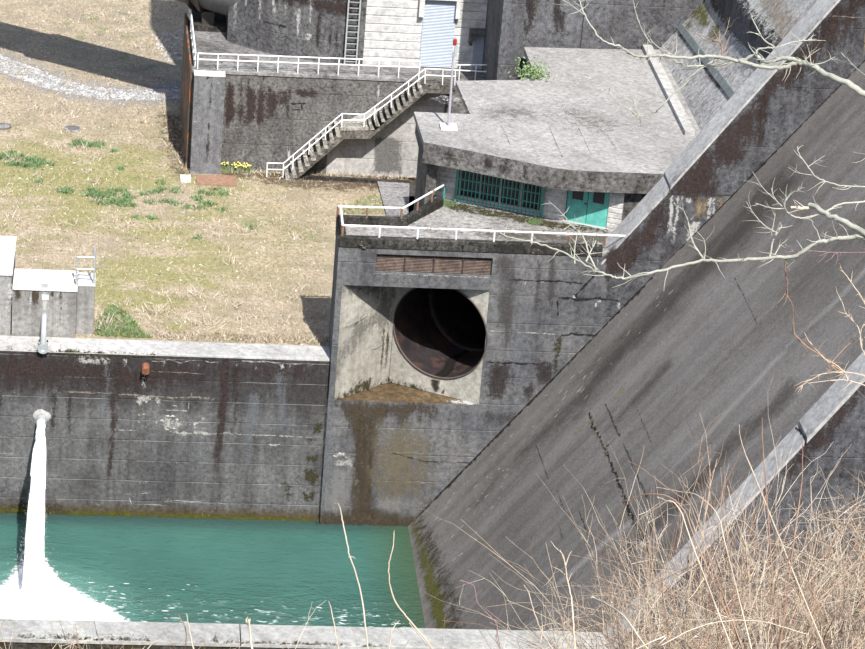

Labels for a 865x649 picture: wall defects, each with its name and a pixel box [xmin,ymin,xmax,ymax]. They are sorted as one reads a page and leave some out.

water stain [537,179,792,450]
water stain [107,393,117,479]
spalling [138,413,204,431]
water stain [214,359,239,463]
water stain [325,402,438,517]
crack [374,270,653,518]
crack [589,404,657,576]